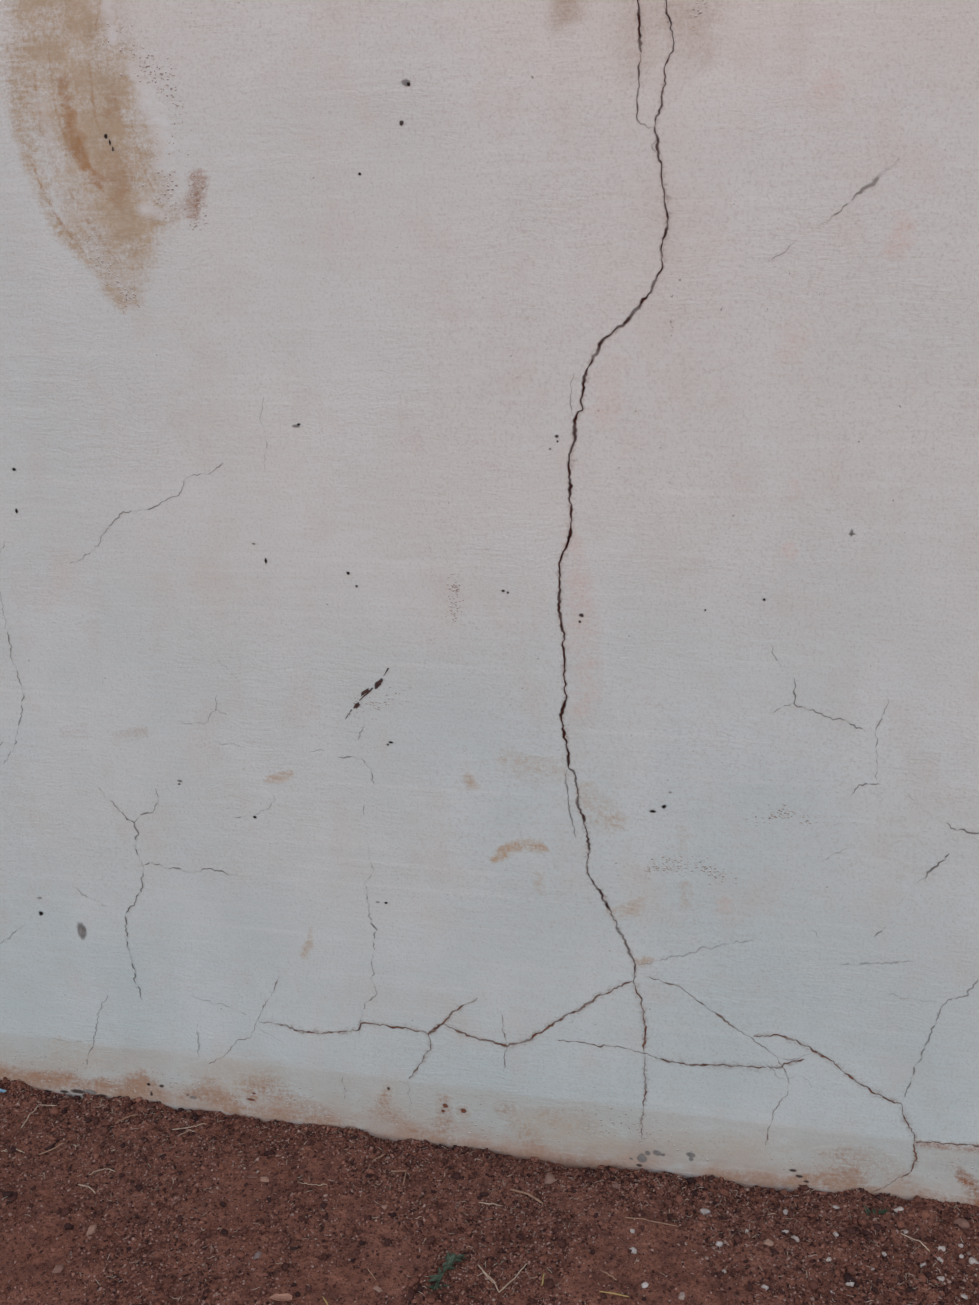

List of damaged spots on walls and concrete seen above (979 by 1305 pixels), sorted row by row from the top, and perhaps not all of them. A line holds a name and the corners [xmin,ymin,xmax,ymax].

leakage [0,0,213,315]
leakage [540,0,743,89]
crack [209,0,979,1194]